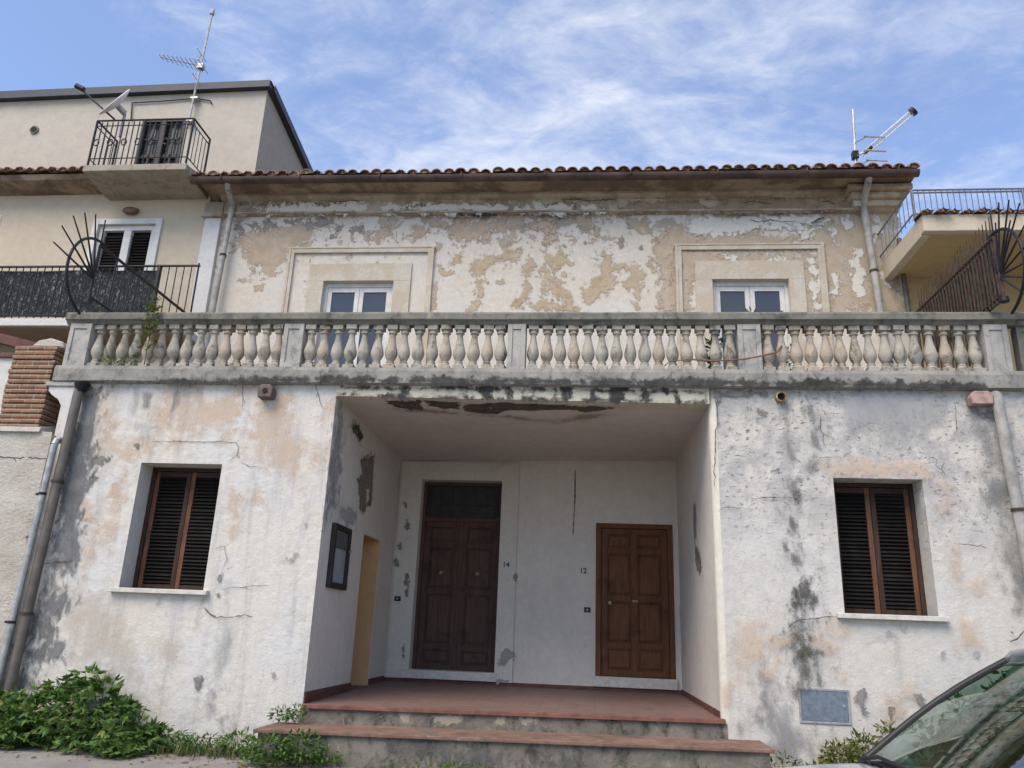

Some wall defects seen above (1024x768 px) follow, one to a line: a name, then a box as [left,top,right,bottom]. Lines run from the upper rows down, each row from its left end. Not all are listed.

peeling [230,199,909,312]
damp [399,385,411,401]
damp [479,386,492,399]
damp [560,387,573,400]
damp [610,387,628,404]
crack [156,440,255,467]
peeling [357,452,375,514]
damp [12,386,109,693]
damp [777,516,832,698]
spalling [498,648,515,666]